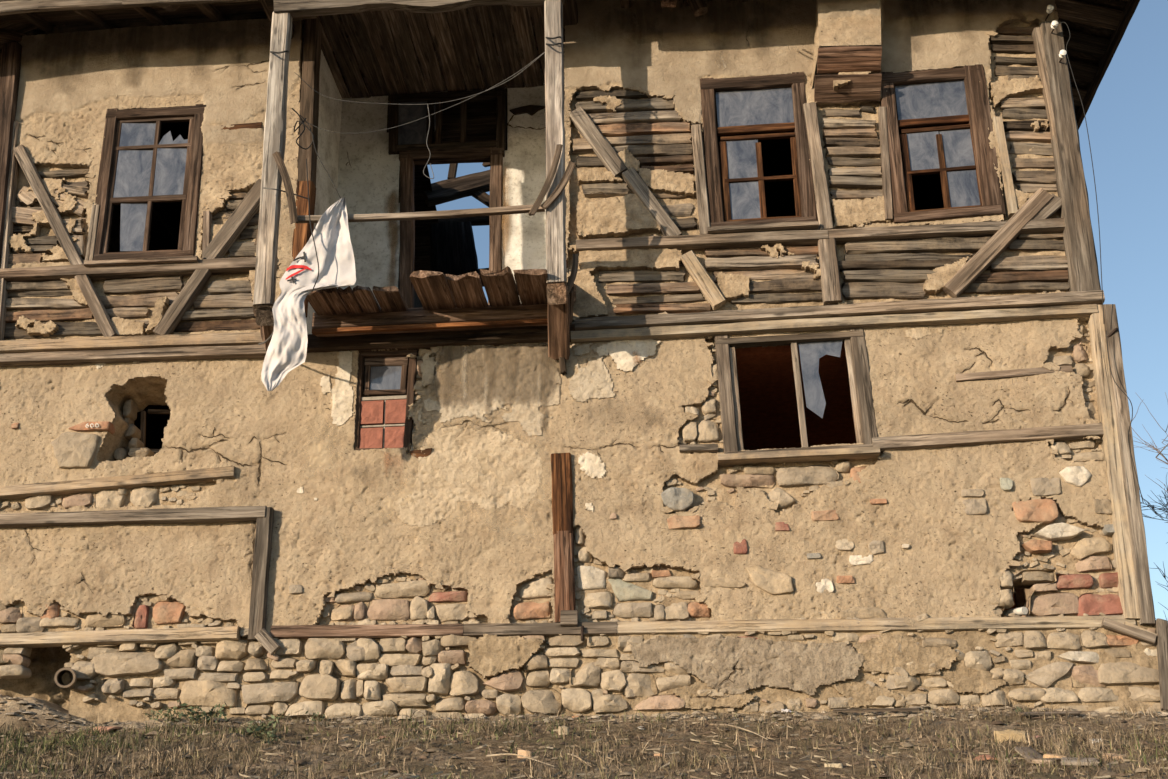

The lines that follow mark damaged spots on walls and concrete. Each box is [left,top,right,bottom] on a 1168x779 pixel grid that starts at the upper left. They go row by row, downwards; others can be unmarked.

spalling [985,15,1057,210]
spalling [8,157,95,266]
spalling [567,85,711,323]
spalling [822,105,991,305]
spalling [4,275,186,339]
spalling [704,243,823,304]
crack [166,427,287,484]
flaking render [393,339,661,527]
crack [960,347,992,373]
crack [898,386,1073,424]
spalling [311,575,481,625]
spalling [983,516,1123,617]